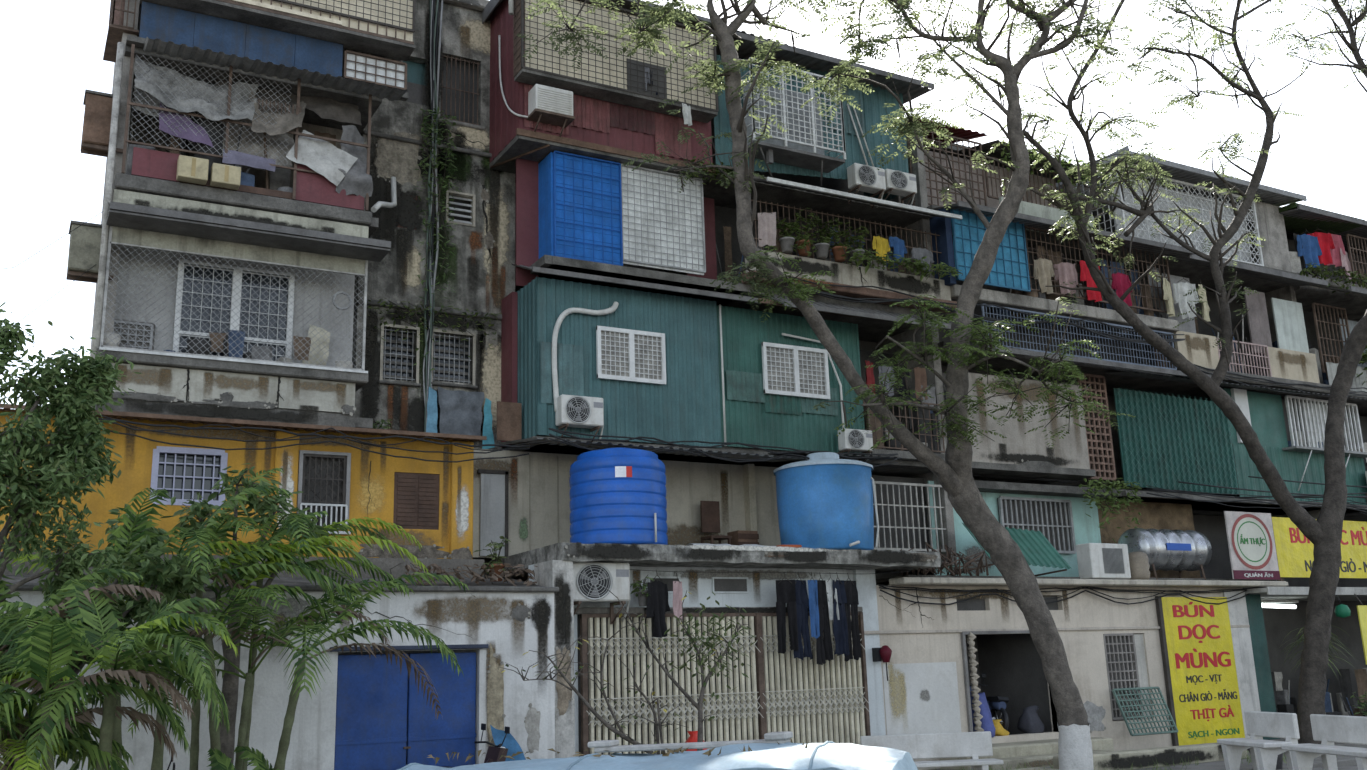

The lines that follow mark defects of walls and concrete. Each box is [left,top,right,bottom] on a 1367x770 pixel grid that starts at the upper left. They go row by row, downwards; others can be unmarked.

leakage [368,13,500,297]
leakage [416,578,572,664]